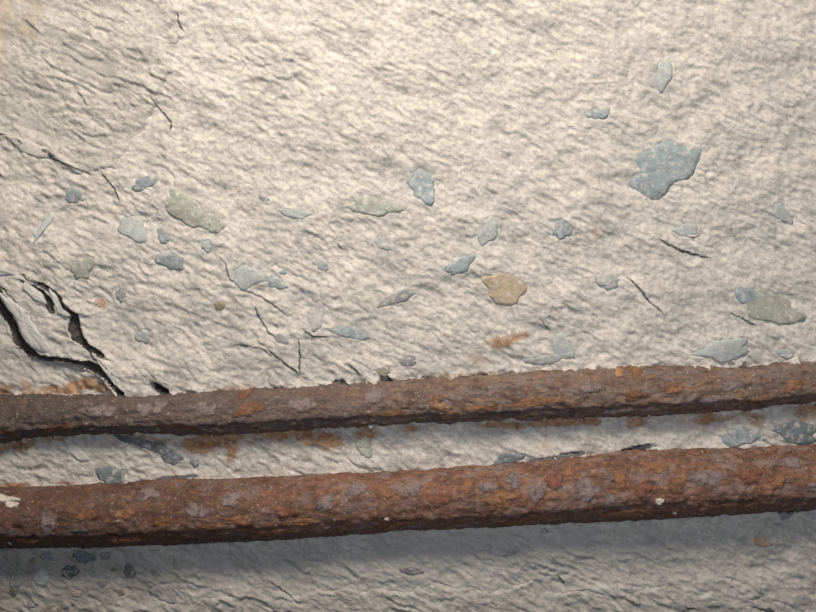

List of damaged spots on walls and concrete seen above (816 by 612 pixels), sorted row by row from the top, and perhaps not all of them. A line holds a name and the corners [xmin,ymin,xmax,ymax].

spalling [0,0,816,397]
crack [0,273,125,397]
rust [31,379,112,395]
rust [182,434,244,459]
rust [254,430,342,451]
spalling [0,401,816,487]
rust [486,418,601,429]
spalling [0,510,816,612]